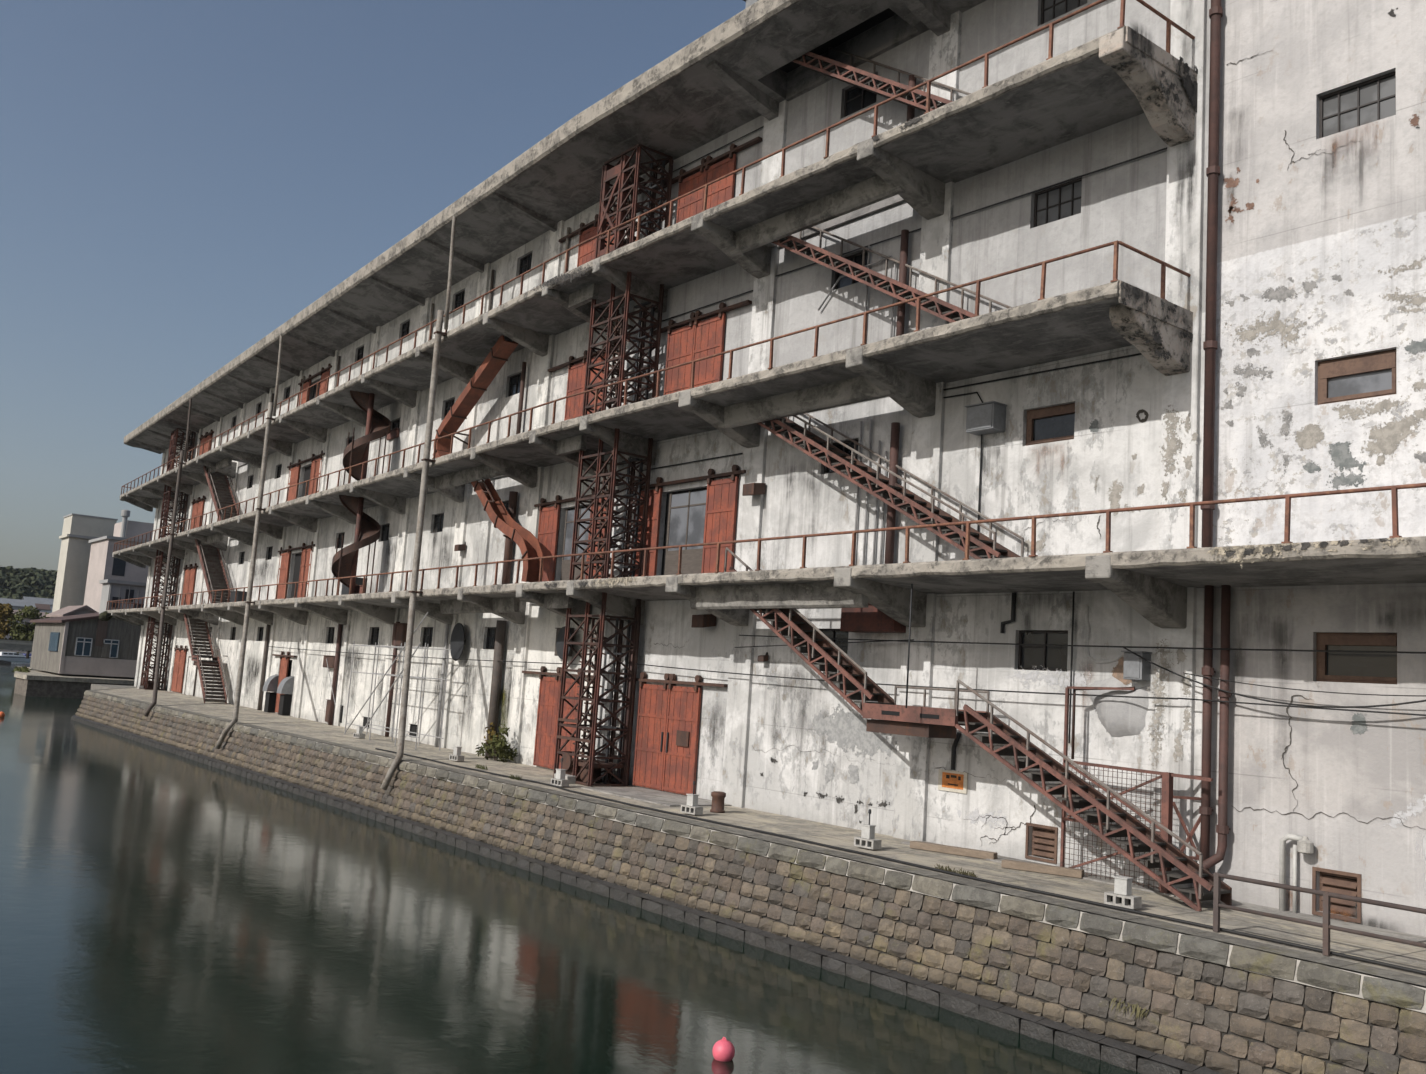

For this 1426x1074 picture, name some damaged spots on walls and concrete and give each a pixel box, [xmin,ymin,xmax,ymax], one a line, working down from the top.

peeling [1223,167,1260,223]
peeling [1378,250,1426,313]
peeling [1221,277,1317,427]
peeling [1404,338,1426,355]
peeling [1256,379,1426,490]
crack [1232,695,1423,829]
crack [967,805,1035,846]